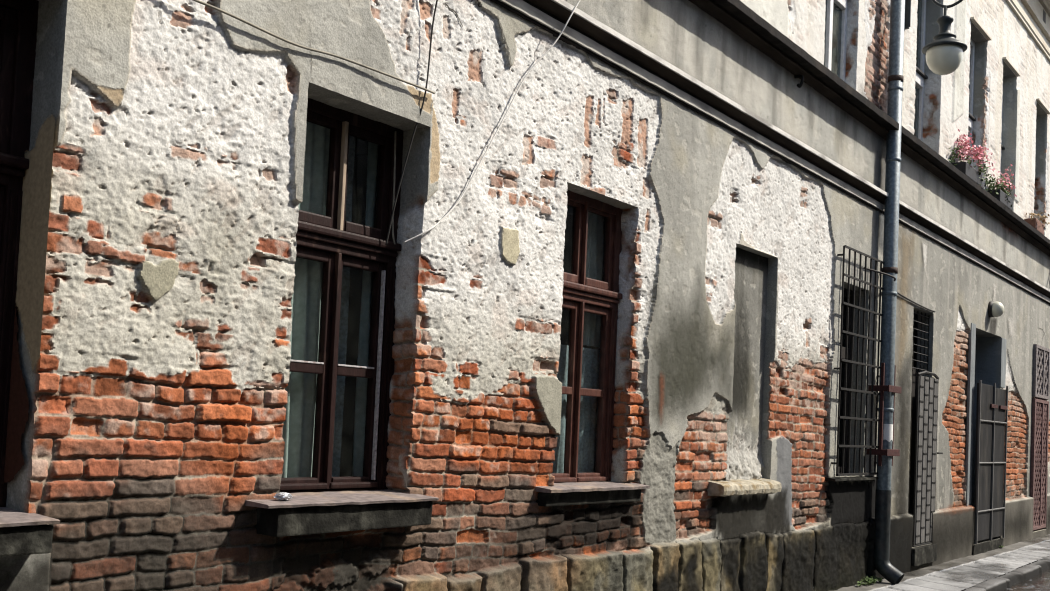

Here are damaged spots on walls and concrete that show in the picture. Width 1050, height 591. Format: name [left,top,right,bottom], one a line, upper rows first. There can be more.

spalling [787,0,797,34]
spalling [4,0,665,591]
damp [545,500,641,555]
damp [652,550,700,591]
spalling [673,392,732,539]
damp [709,490,792,591]
spalling [705,137,835,529]
spalling [942,305,971,507]
spalling [1003,349,1029,500]